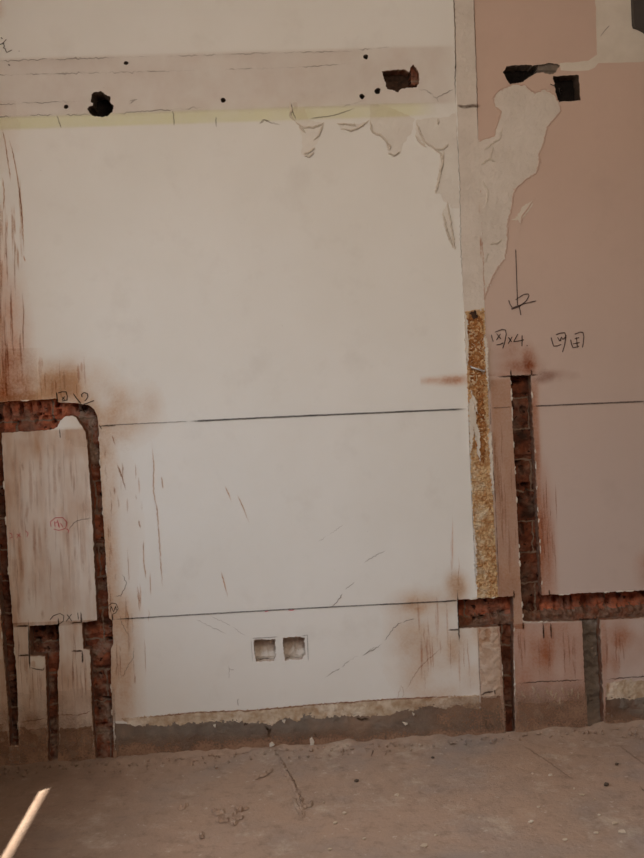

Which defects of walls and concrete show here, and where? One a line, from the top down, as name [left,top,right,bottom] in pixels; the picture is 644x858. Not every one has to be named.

peeling [478,63,562,300]
crack [255,757,313,818]